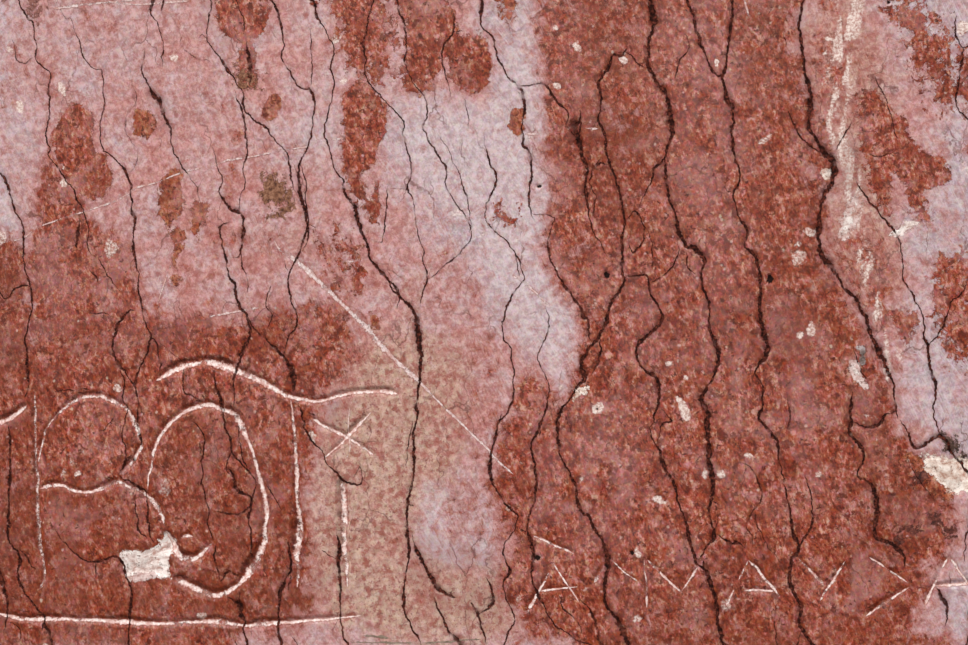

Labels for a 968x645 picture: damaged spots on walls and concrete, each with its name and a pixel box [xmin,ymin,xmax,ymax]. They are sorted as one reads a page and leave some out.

crack [0,173,33,398]
crack [12,0,200,541]
crack [123,0,815,645]
crack [783,0,968,570]
crack [0,426,53,645]
crack [55,529,133,645]
spalling [119,531,177,583]
crack [937,588,949,625]
spalling [920,452,968,495]